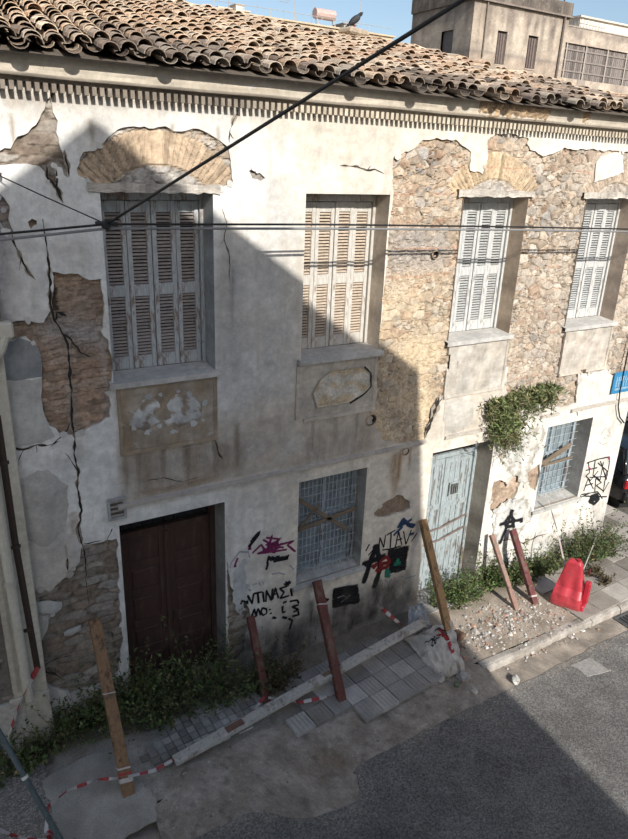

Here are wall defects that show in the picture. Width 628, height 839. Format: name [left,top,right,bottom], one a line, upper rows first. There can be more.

flaking render [0,98,67,184]
crack [44,150,71,203]
flaking render [77,126,234,192]
flaking render [313,133,628,456]
flaking render [12,272,112,439]
crack [12,219,112,614]
peeling [128,390,208,435]
flaking render [374,495,408,516]
peeling [489,423,546,544]
flaking render [35,539,124,692]